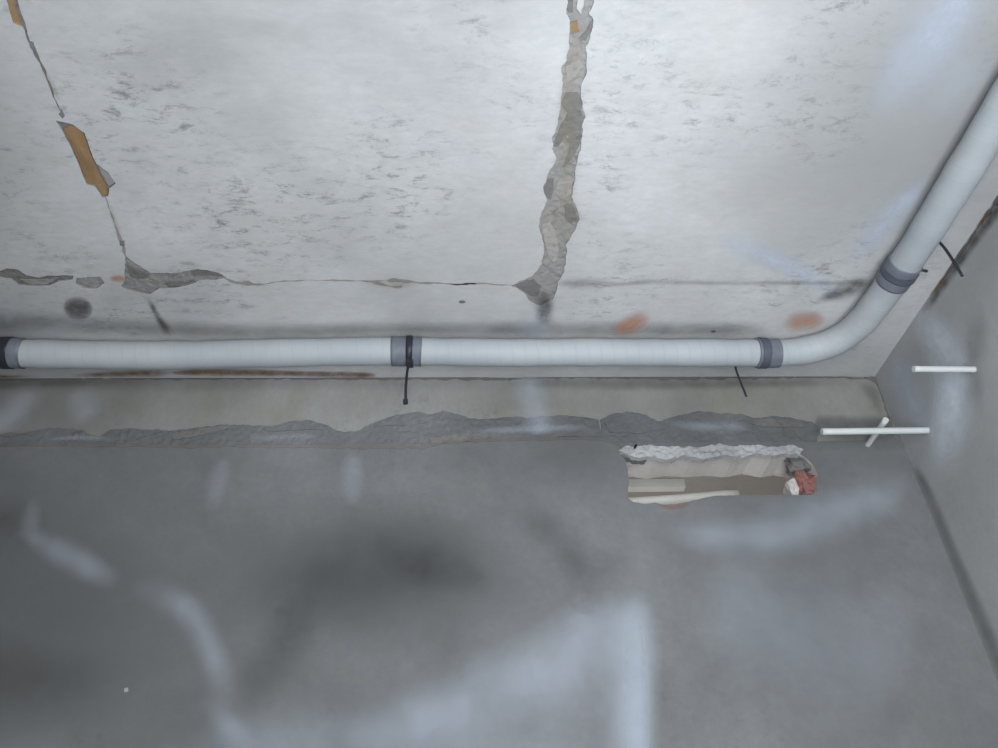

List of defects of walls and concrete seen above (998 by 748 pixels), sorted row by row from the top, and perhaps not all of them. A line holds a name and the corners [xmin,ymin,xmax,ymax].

crack [24,28,60,110]
crack [105,196,126,257]
crack [224,278,515,289]
spalling [619,443,816,495]